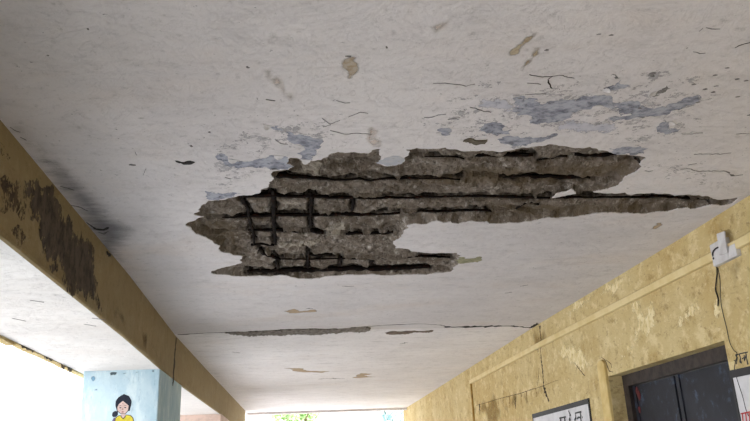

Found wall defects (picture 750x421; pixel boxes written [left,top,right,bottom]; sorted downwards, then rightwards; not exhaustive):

damp [343,57,358,78]
spalling [186,70,737,279]
crack [172,332,225,384]
crack [429,323,557,406]